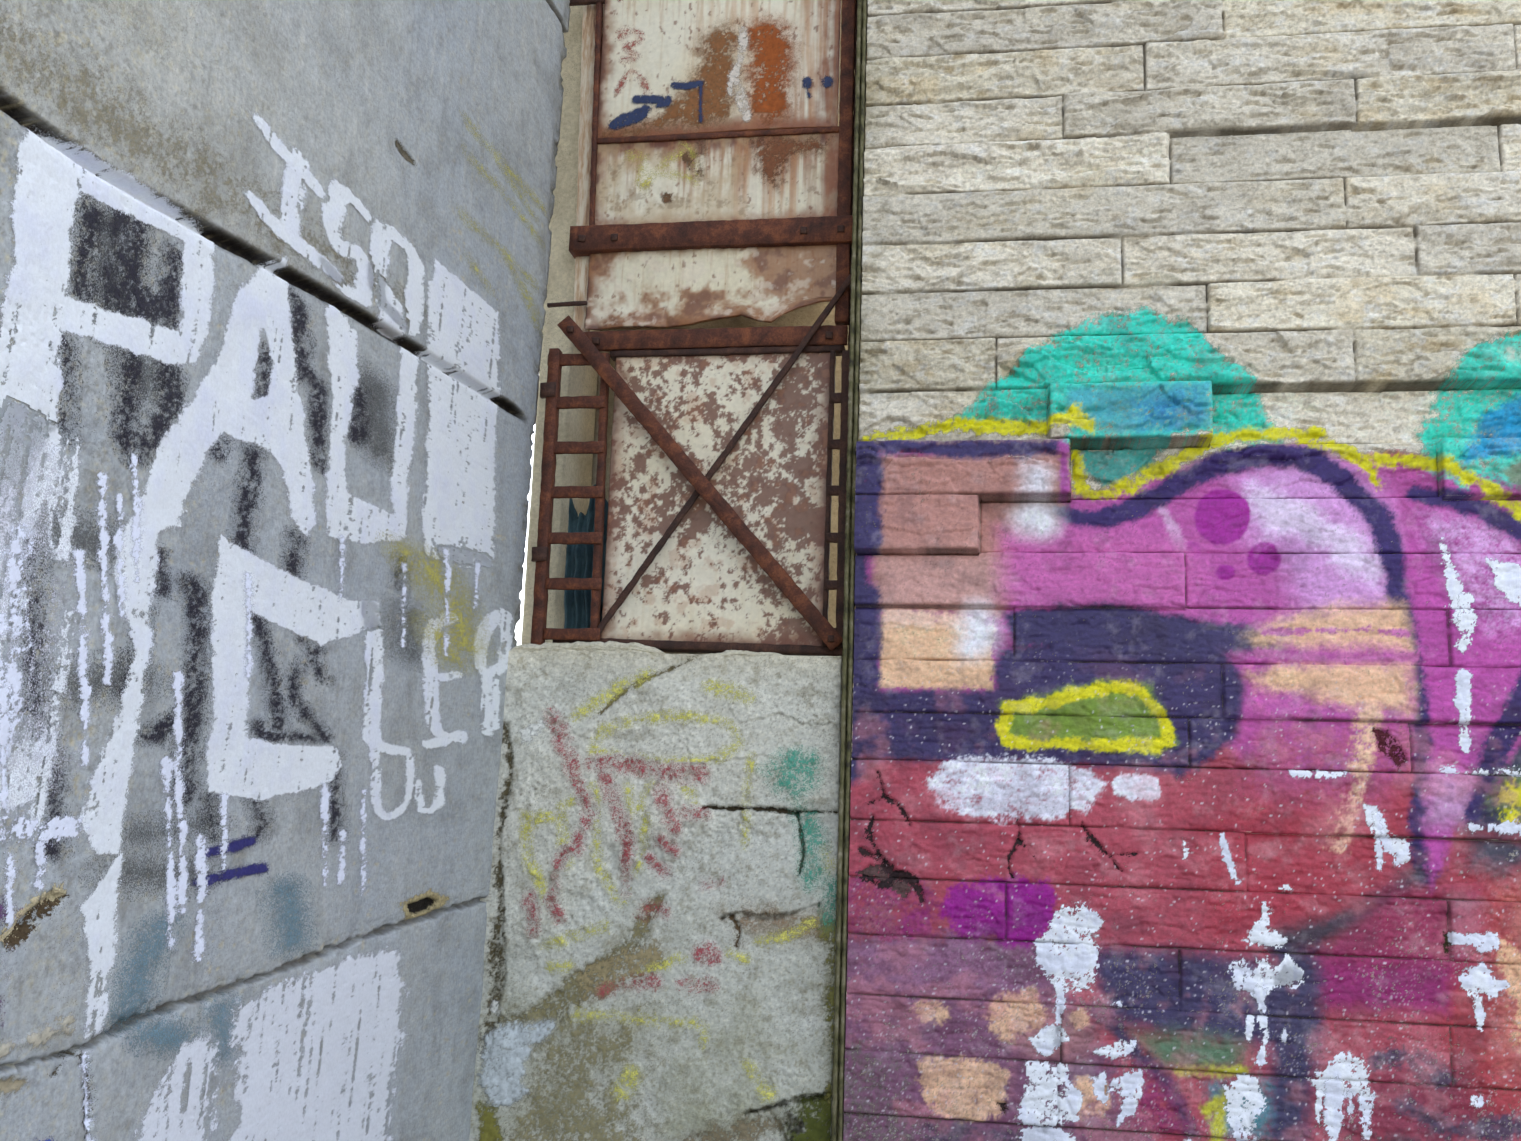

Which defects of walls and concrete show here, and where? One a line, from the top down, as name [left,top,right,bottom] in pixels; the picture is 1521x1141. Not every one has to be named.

rust [602,20,829,186]
crack [700,771,926,911]
crack [1007,818,1035,881]
crack [1080,823,1138,872]
crack [721,915,743,948]